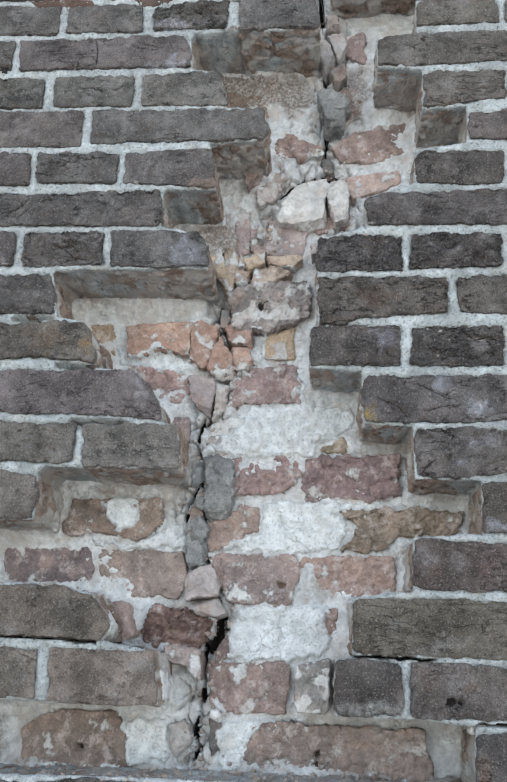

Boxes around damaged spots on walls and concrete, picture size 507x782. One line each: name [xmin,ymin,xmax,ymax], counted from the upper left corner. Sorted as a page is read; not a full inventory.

spalling [31,0,97,12]
crack [318,0,326,33]
spalling [345,32,367,65]
crack [280,178,338,200]
spalling [234,87,406,257]
crack [126,247,303,385]
crack [198,421,211,460]
crack [186,483,207,523]
spalling [4,280,465,782]
crack [204,598,230,666]
crack [194,687,208,759]